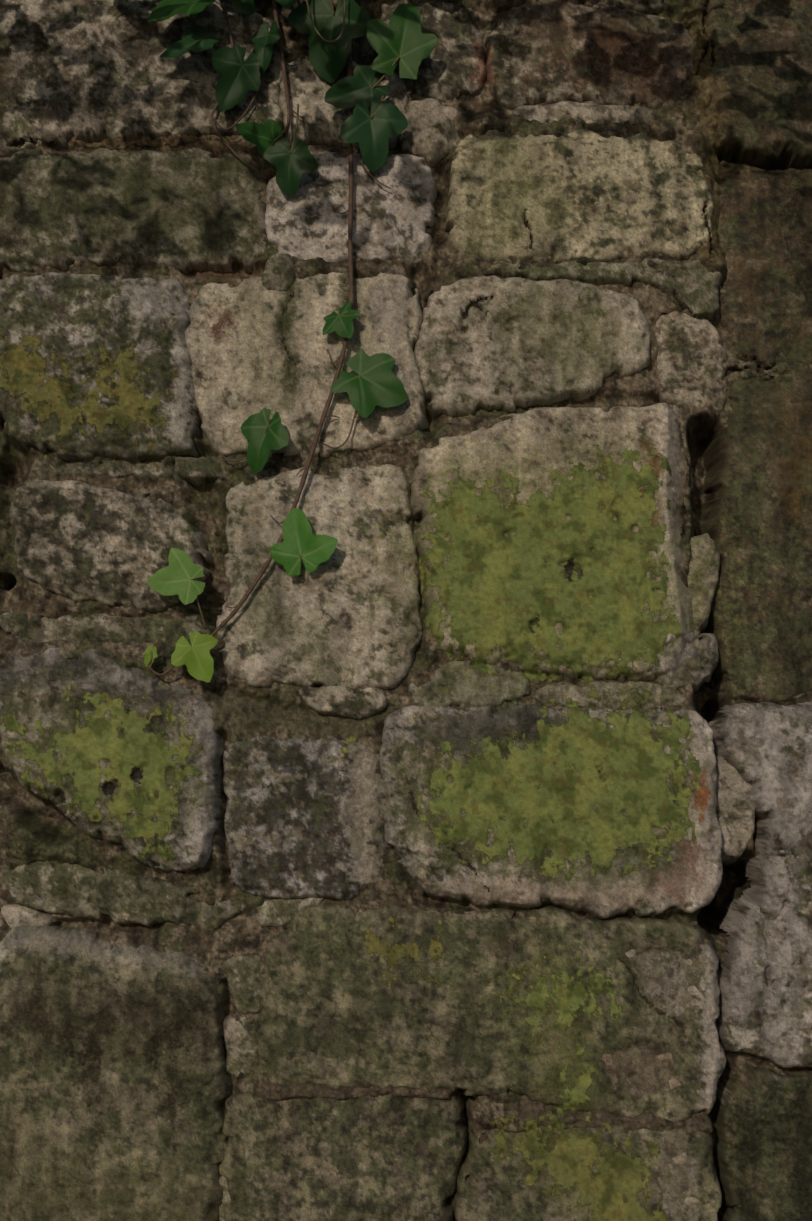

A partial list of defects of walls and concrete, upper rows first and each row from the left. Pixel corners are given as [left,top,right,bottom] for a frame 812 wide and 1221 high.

crack [522,208,534,250]
crack [461,295,494,319]